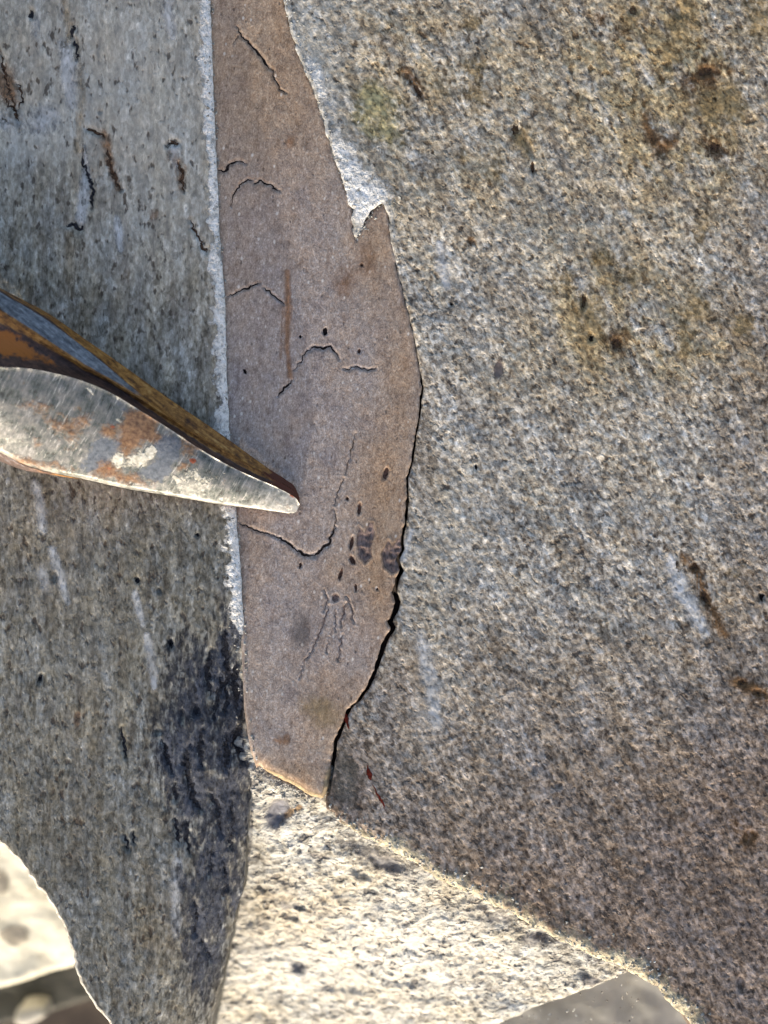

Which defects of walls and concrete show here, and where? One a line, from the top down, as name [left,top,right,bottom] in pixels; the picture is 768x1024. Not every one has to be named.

corrosion [102,131,120,191]
leakage [196,0,230,440]
crack [218,161,278,205]
crack [235,28,285,93]
spalling [285,0,395,240]
crack [277,345,376,397]
crack [240,435,355,557]
crack [406,374,423,500]
spalling [338,537,355,581]
crack [331,592,400,767]
leakage [132,505,292,1010]
spalling [266,769,331,798]